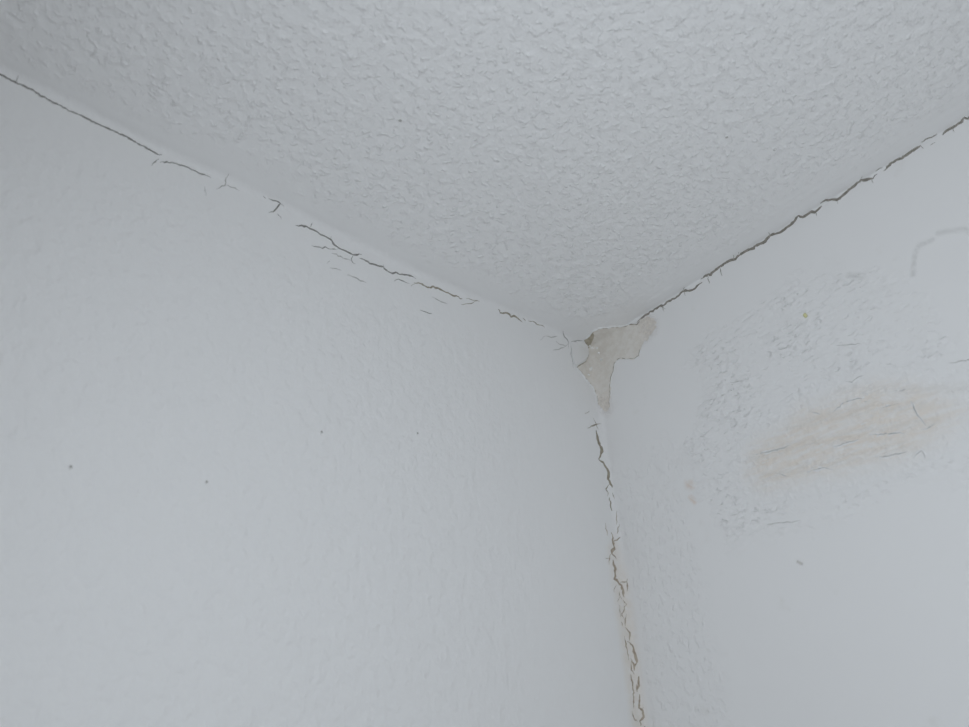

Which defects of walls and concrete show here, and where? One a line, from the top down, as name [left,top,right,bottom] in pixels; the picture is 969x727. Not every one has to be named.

crack [0,74,237,195]
crack [263,196,584,368]
peeling [571,316,657,412]
crack [636,116,969,323]
crack [585,411,653,727]